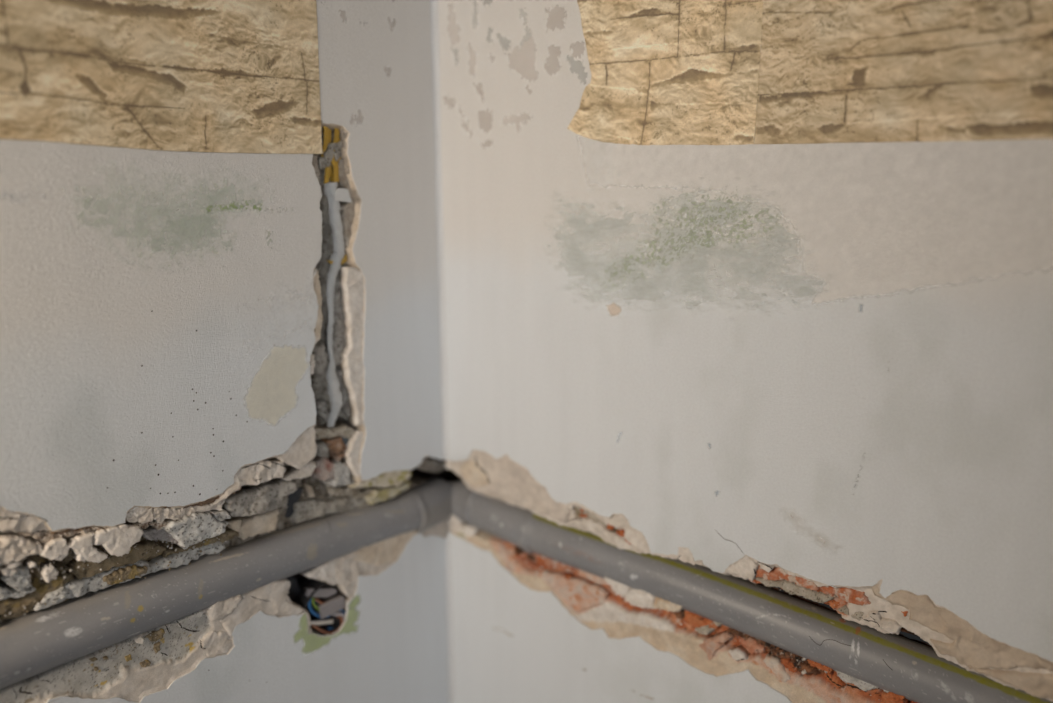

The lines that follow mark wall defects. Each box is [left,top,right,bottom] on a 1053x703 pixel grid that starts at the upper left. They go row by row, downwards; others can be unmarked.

spalling [0,423,1053,703]